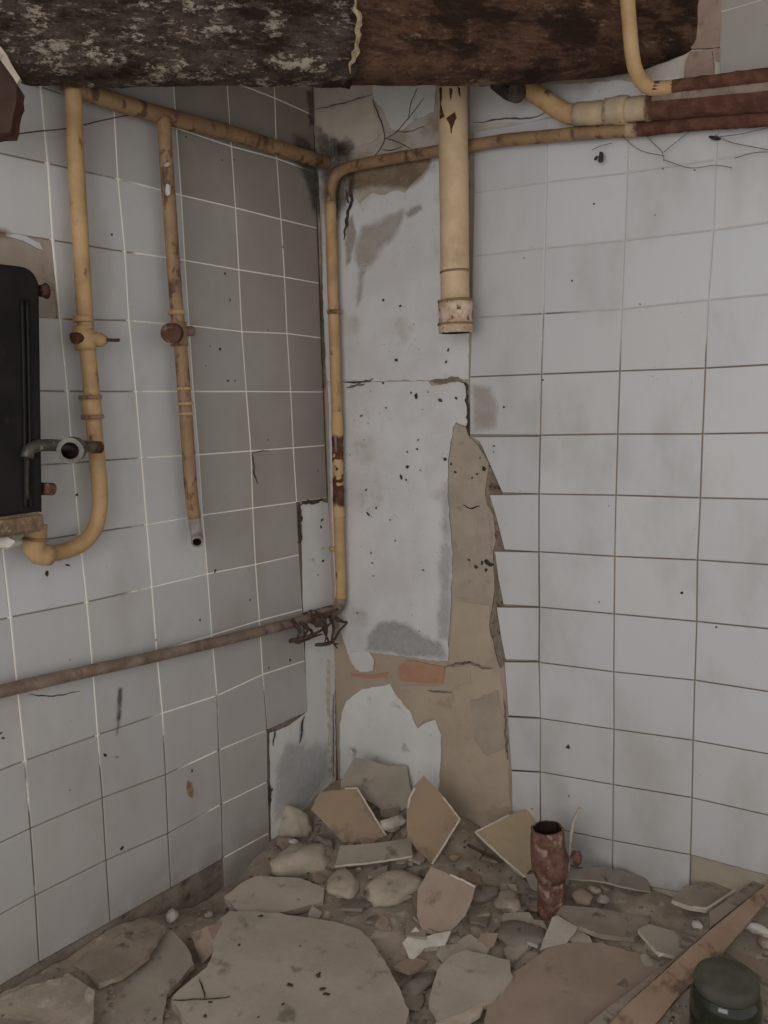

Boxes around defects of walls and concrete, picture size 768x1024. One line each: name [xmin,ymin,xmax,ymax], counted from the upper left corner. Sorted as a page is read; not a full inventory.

crack [318,88,424,155]
corrosion [624,67,768,138]
leakage [296,135,429,223]
leakage [357,213,401,271]
peeling [269,157,536,934]
leakage [369,549,448,656]